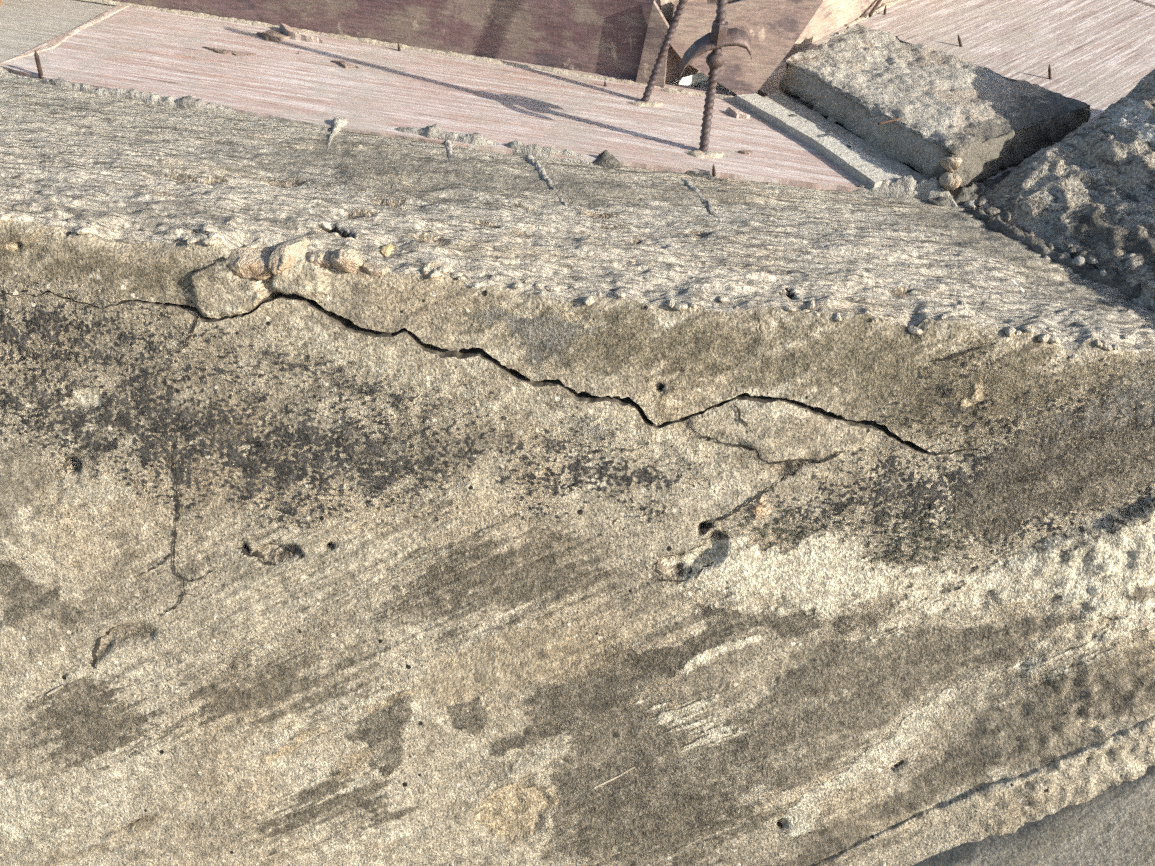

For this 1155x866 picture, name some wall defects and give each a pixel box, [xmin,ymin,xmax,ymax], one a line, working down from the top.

damp [0,227,56,251]
crack [191,257,228,272]
spalling [887,286,912,298]
damp [903,202,1115,305]
damp [1071,212,1155,266]
damp [0,278,749,542]
crack [1,278,1026,522]
damp [0,563,85,628]